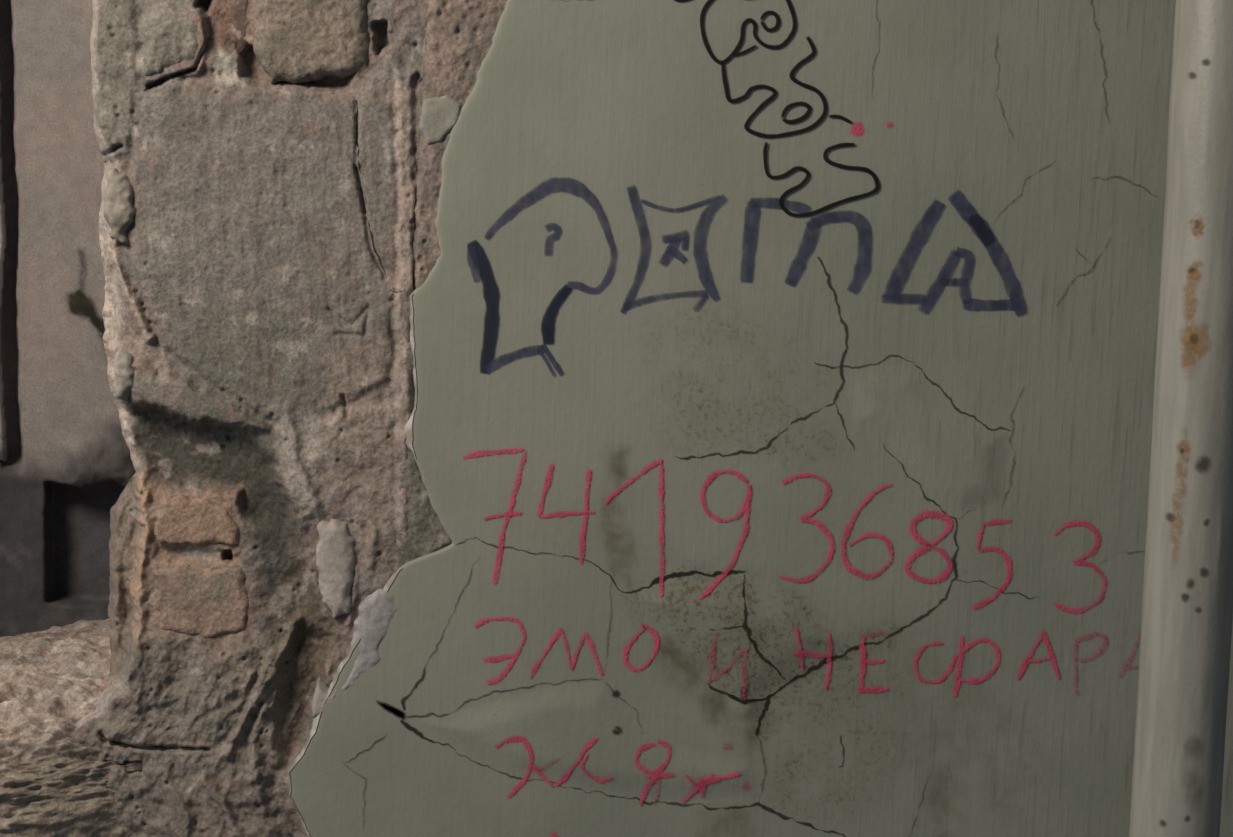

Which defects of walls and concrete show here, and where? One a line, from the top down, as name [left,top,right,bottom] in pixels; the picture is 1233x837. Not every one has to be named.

spalling [68,0,507,837]
crack [675,257,1011,460]
rust [1183,263,1207,366]
crack [348,444,1038,837]